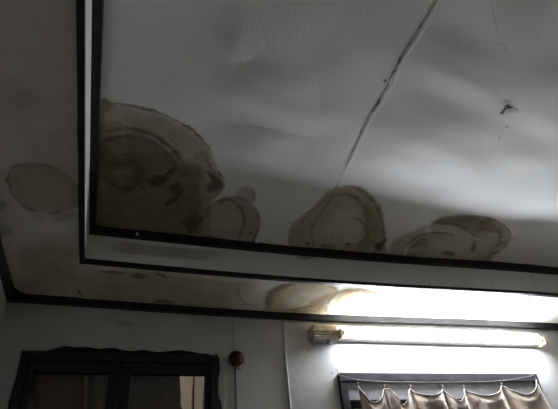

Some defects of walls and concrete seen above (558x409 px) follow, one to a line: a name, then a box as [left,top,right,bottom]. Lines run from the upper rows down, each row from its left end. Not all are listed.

leakage [97,105,259,238]
leakage [290,186,386,254]
leakage [265,284,386,315]